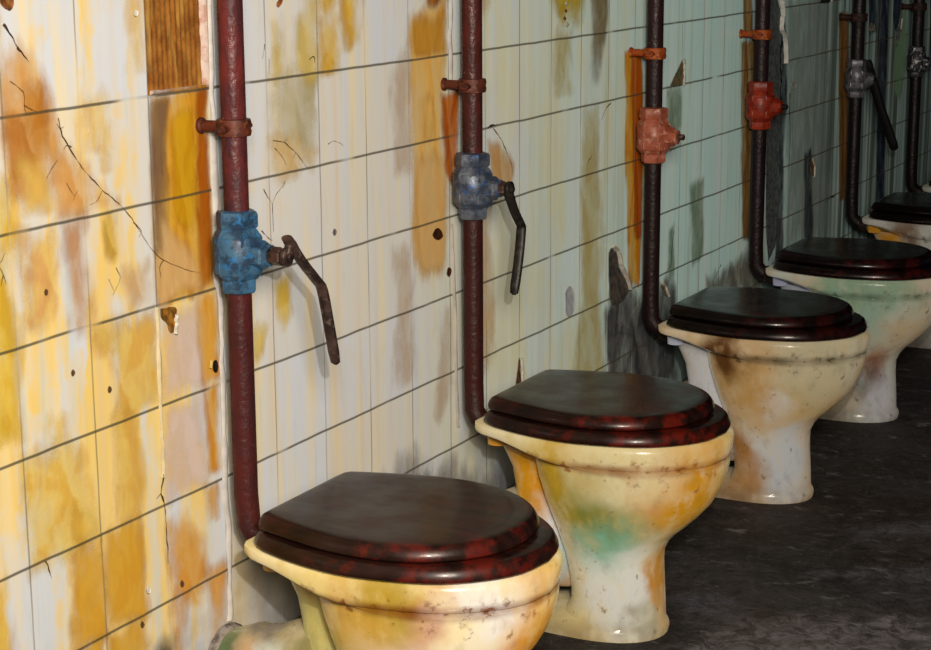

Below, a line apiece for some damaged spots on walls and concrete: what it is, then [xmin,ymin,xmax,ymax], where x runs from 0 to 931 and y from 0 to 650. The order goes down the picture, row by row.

spalling [0,0,14,10]
leakage [0,277,19,438]
leakage [0,54,88,249]
crack [46,118,200,274]
spalling [161,307,180,334]
corrosion [409,0,459,270]
peeling [609,244,633,305]
leakage [577,120,676,379]
corrosion [625,52,643,286]
spalling [670,59,686,87]
leakage [22,317,157,650]
leakage [170,527,226,614]